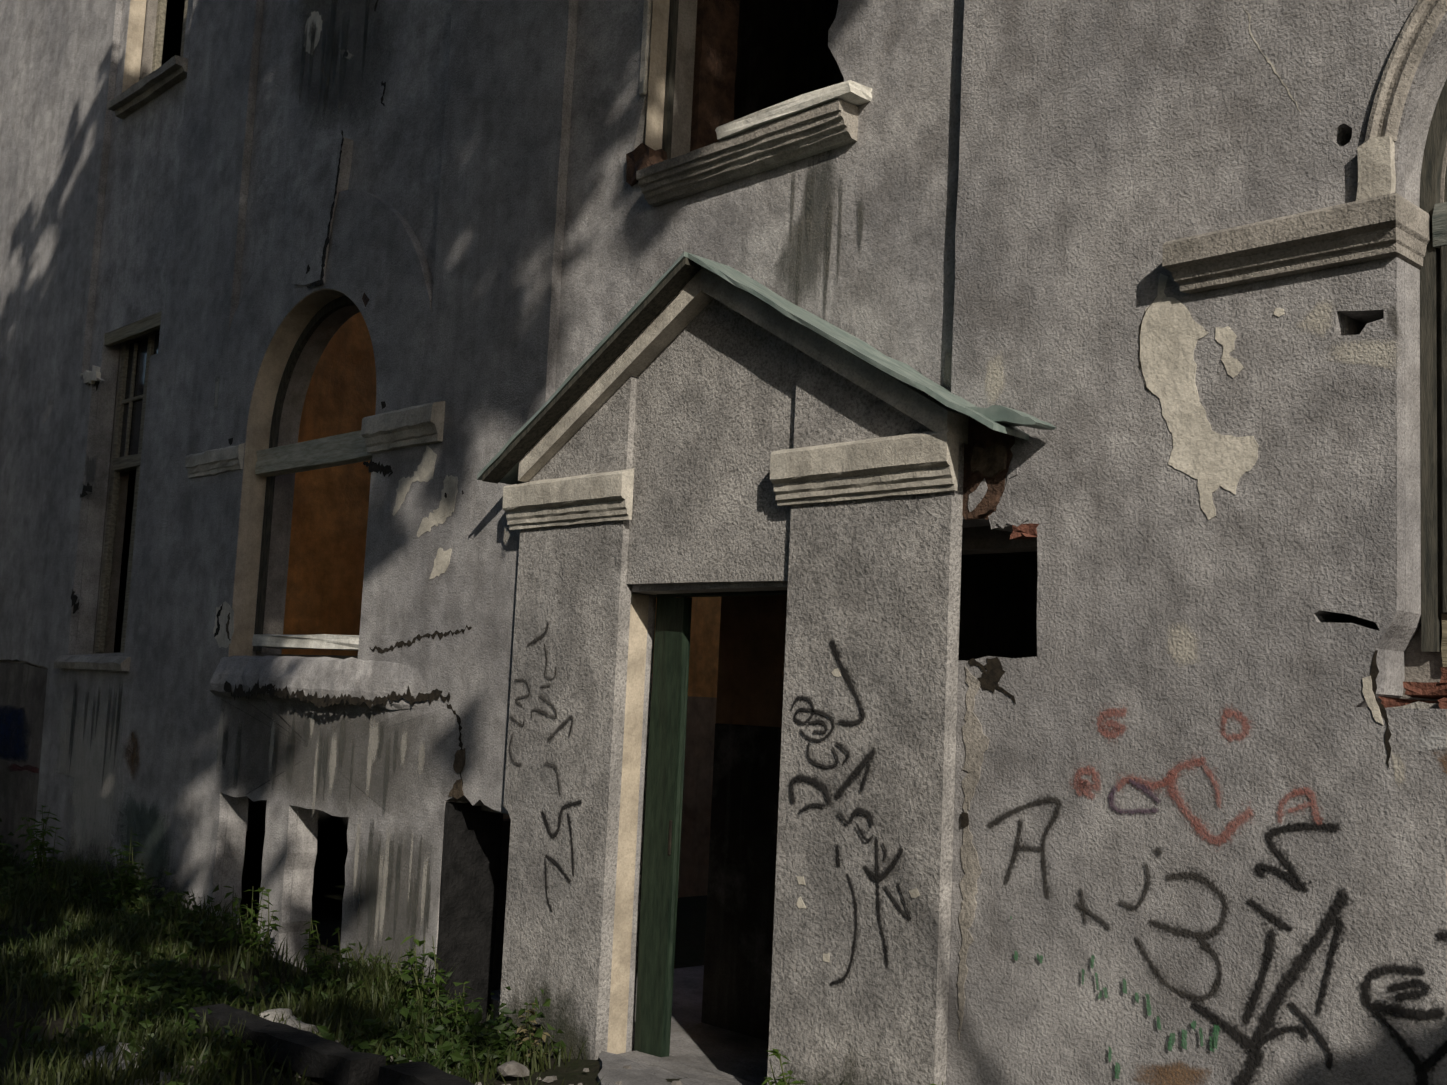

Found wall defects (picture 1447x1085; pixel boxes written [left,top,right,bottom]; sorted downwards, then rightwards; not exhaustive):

flaking render [1139,273,1259,520]
flaking render [392,446,464,538]
spalling [962,416,1039,540]
flaking render [429,548,452,580]
crack [370,625,472,654]
water stain [217,706,425,810]
crack [224,679,465,799]
crack [1362,650,1405,783]
water stain [353,825,431,976]